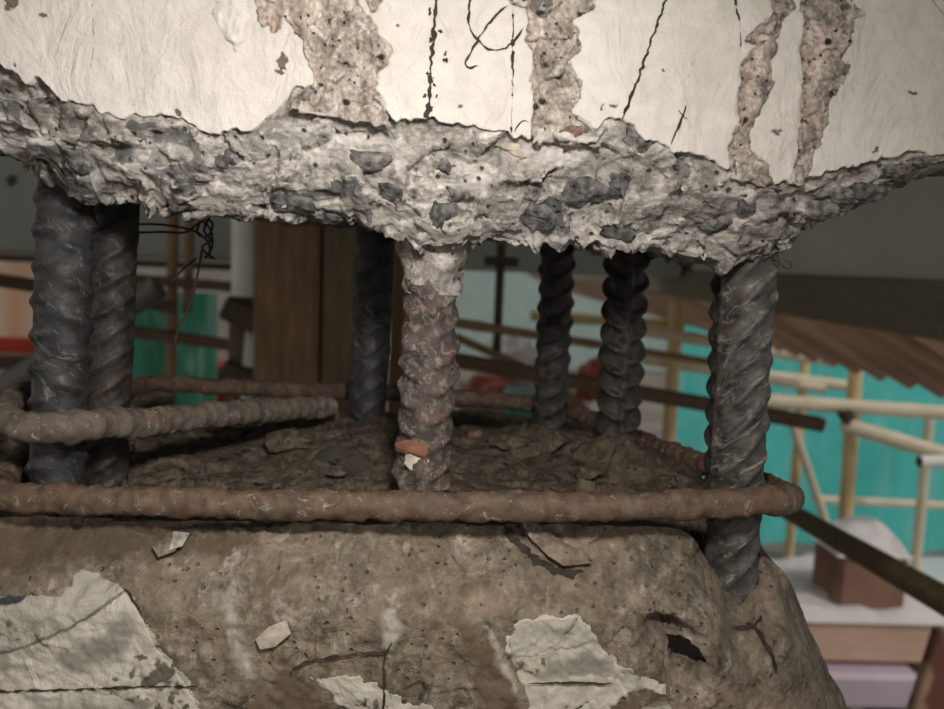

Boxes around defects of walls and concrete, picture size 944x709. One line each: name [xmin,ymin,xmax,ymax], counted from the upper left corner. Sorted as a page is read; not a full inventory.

crack [423,0,528,133]
crack [622,0,667,119]
spalling [0,0,944,492]
spalling [705,514,763,606]
crack [0,685,197,693]
peeling [0,569,200,709]
peeling [310,675,434,709]
peeling [505,610,706,709]